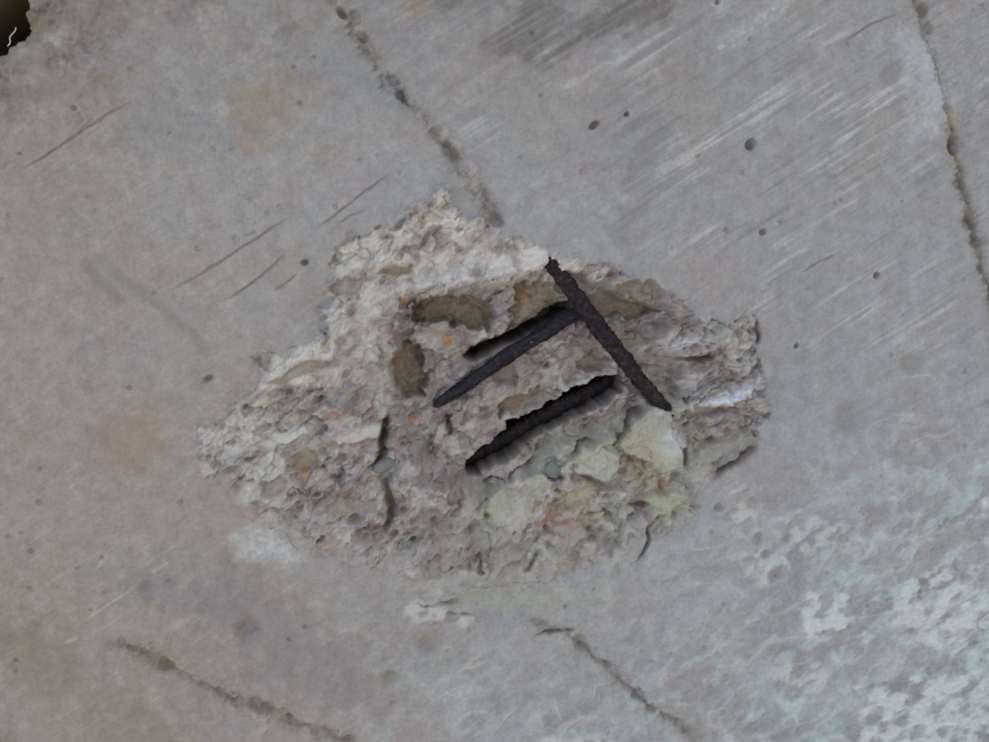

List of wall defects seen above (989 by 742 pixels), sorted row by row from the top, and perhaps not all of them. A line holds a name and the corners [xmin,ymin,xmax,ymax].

crack [0,0,32,57]
crack [14,100,137,177]
spalling [194,184,871,633]
crack [532,628,575,640]
peeling [548,628,591,653]
peeling [762,654,839,697]